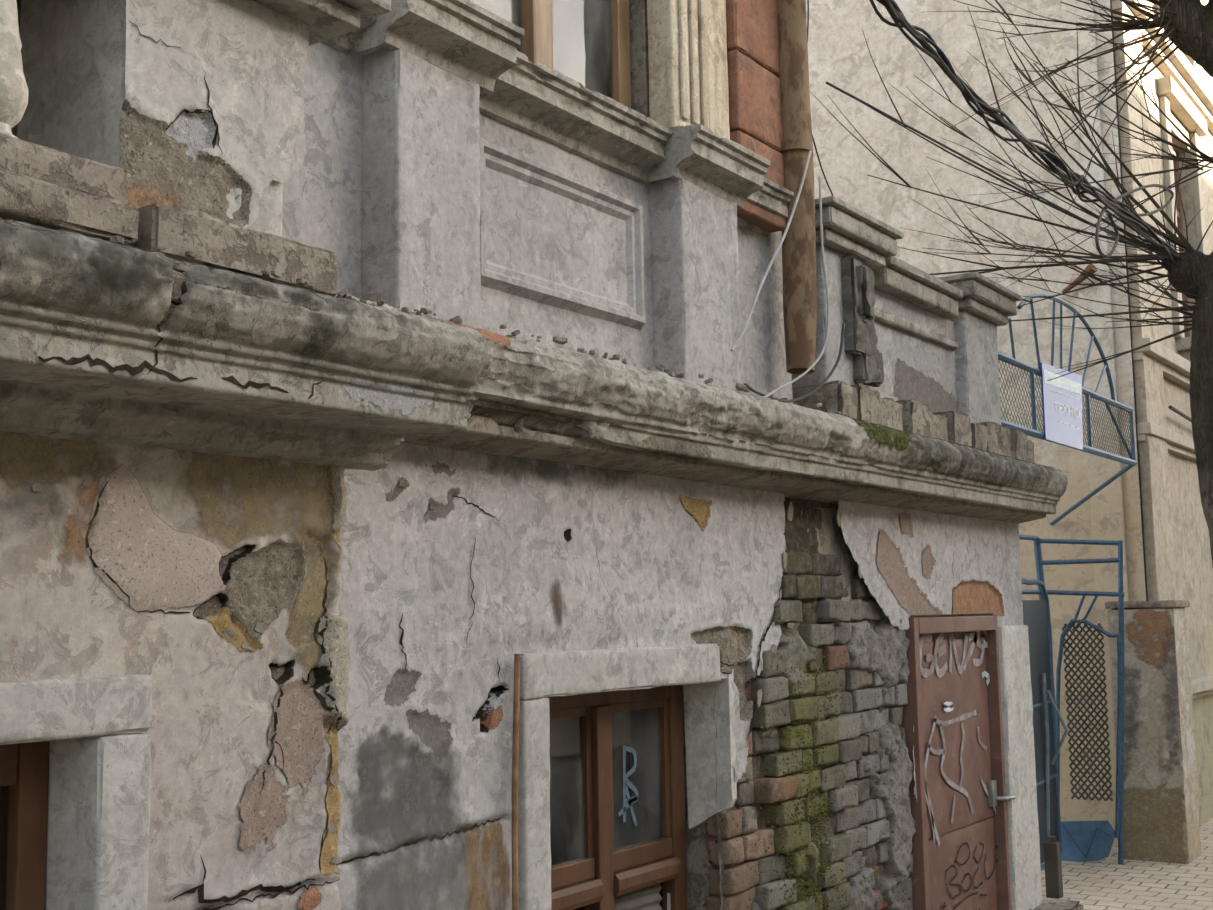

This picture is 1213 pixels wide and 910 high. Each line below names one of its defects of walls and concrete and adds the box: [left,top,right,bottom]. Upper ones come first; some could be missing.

flaking render [119,99,252,227]
crack [38,268,324,399]
crack [85,481,135,611]
flaking render [193,520,342,875]
spalling [472,660,509,732]
flaking render [691,626,762,721]
peeling [358,709,453,842]
crack [173,817,504,910]